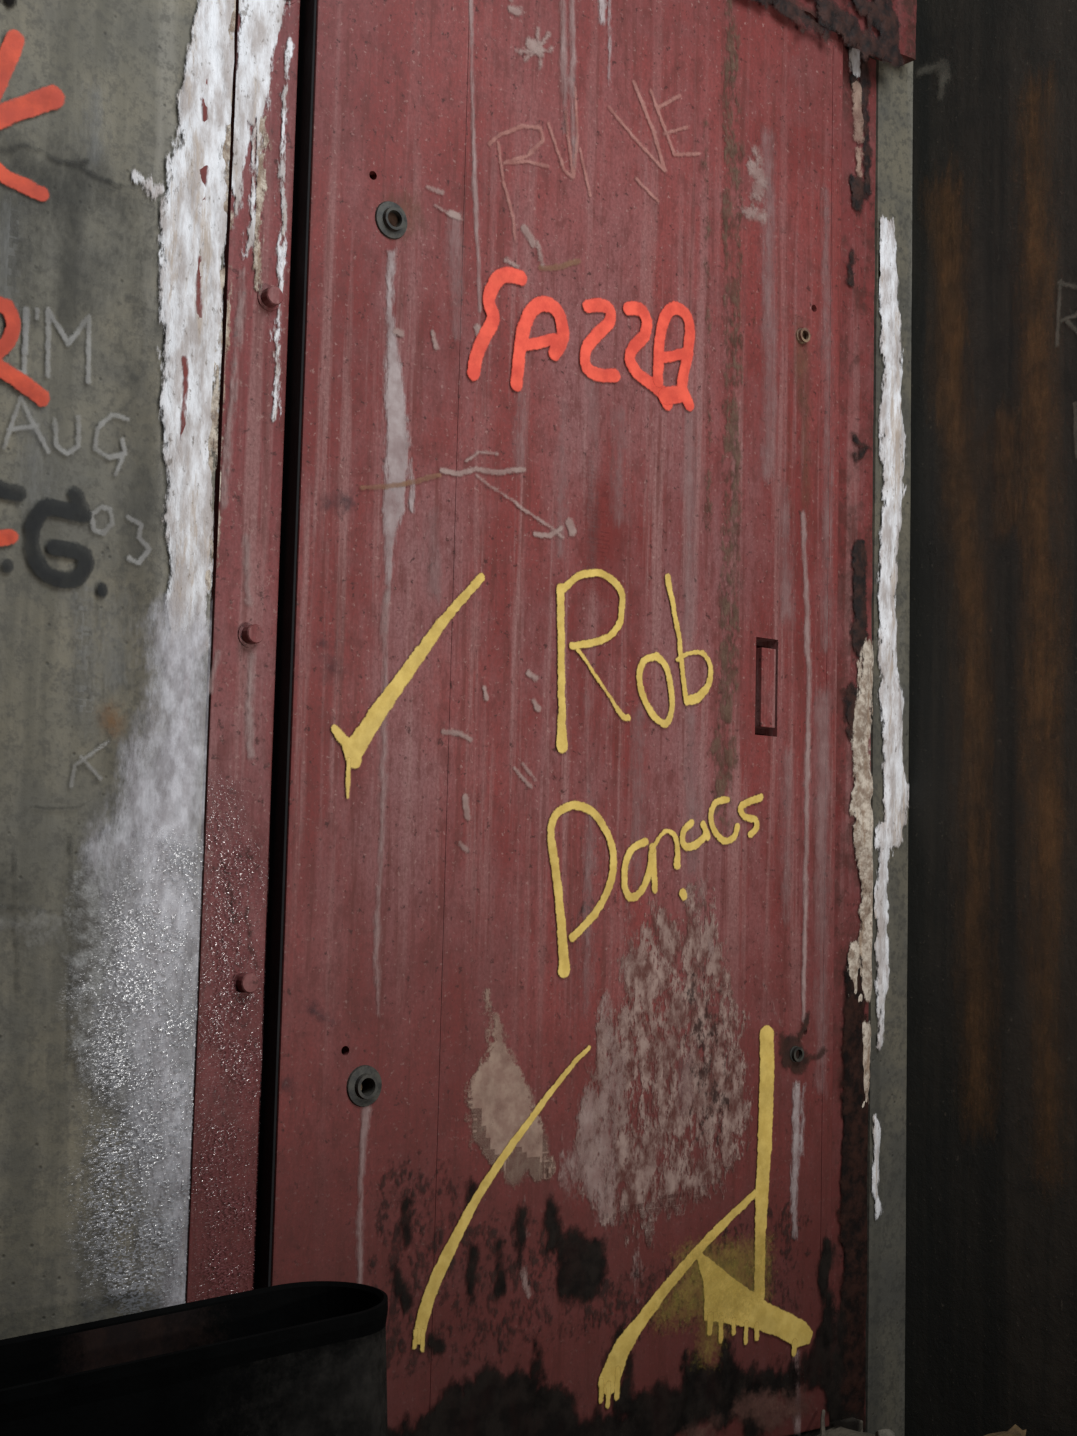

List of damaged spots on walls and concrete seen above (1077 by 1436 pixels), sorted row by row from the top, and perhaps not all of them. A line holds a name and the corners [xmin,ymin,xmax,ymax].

rust [751,0,905,213]
rust [846,249,857,286]
rust [704,0,744,823]
rust [852,433,872,463]
water stain [85,0,262,1311]
rust [840,680,860,741]
rust [850,539,869,657]
peeling [466,879,753,1247]
peeling [369,1151,813,1372]
rust [733,957,868,1436]